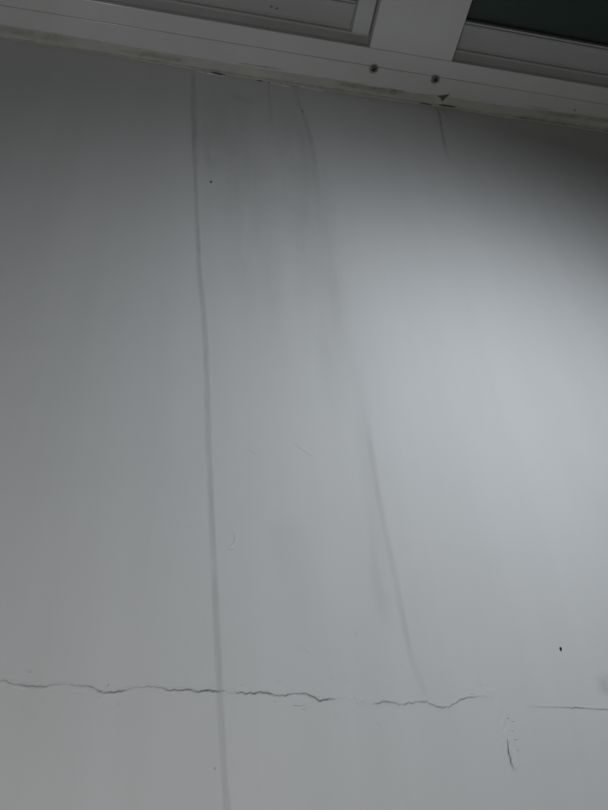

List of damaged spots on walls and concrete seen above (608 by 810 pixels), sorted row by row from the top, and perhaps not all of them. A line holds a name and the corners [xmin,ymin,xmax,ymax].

crack [0,671,493,712]
crack [526,703,608,711]